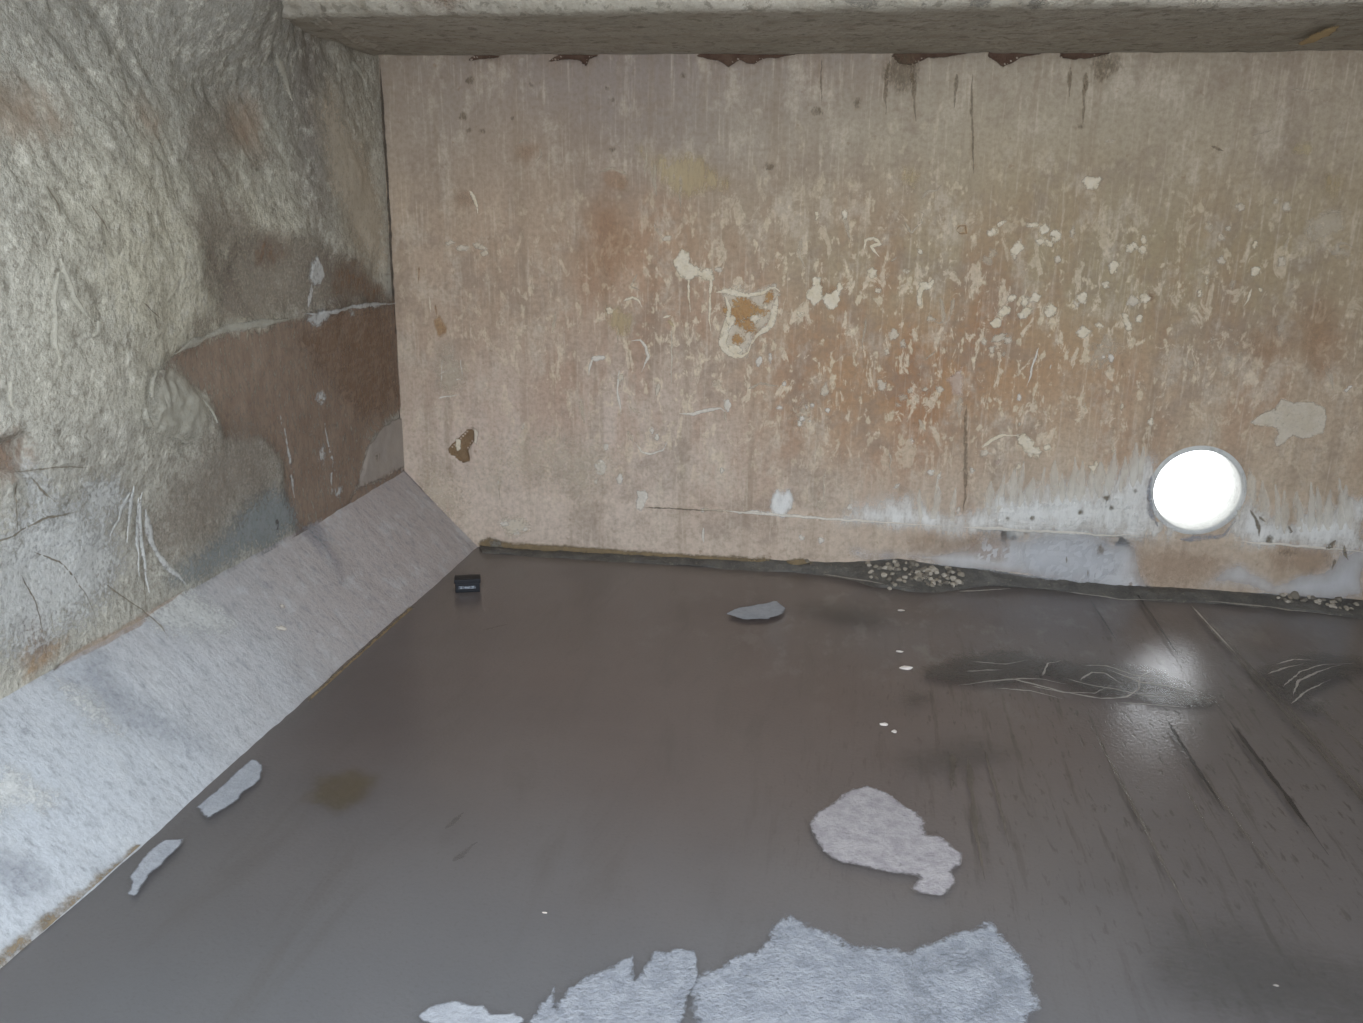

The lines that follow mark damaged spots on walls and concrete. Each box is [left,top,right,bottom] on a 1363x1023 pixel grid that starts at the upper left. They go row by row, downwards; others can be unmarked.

peeling [663,236,780,358]
peeling [157,300,404,531]
peeling [1252,400,1326,446]
damp [855,459,1169,586]
damp [1227,500,1363,598]